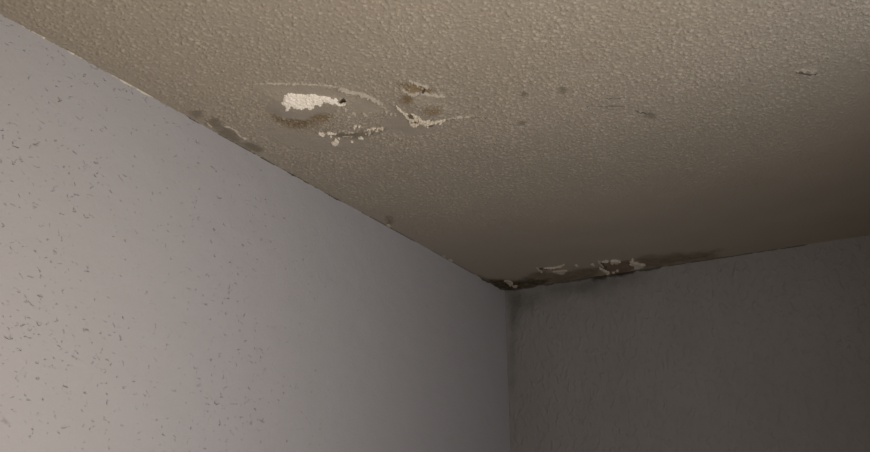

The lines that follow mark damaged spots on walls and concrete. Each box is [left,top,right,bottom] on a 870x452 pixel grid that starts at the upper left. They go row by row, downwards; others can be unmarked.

peeling [253,82,446,146]
spalling [590,258,646,275]